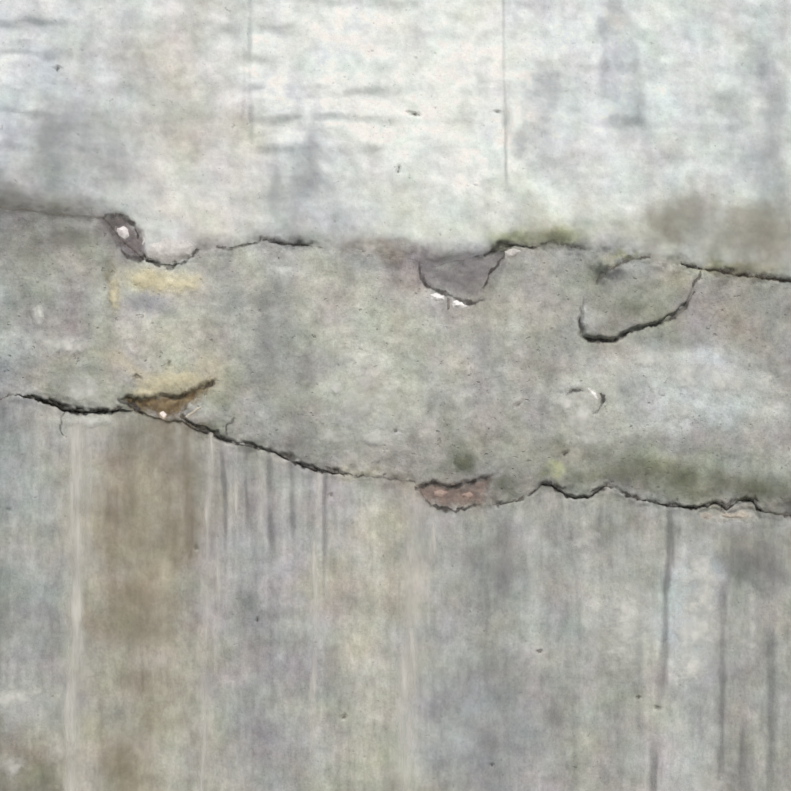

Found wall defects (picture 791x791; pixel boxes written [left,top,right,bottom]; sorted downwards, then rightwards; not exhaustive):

spalling [105,213,199,269]
spalling [419,248,521,310]
crack [578,263,791,343]
damp [39,334,84,353]
crack [7,394,122,422]
damp [70,379,99,403]
spalling [118,382,213,430]
crack [181,417,363,477]
spalling [415,479,488,513]
crack [500,481,758,513]
damp [71,574,82,663]
damp [676,555,716,679]